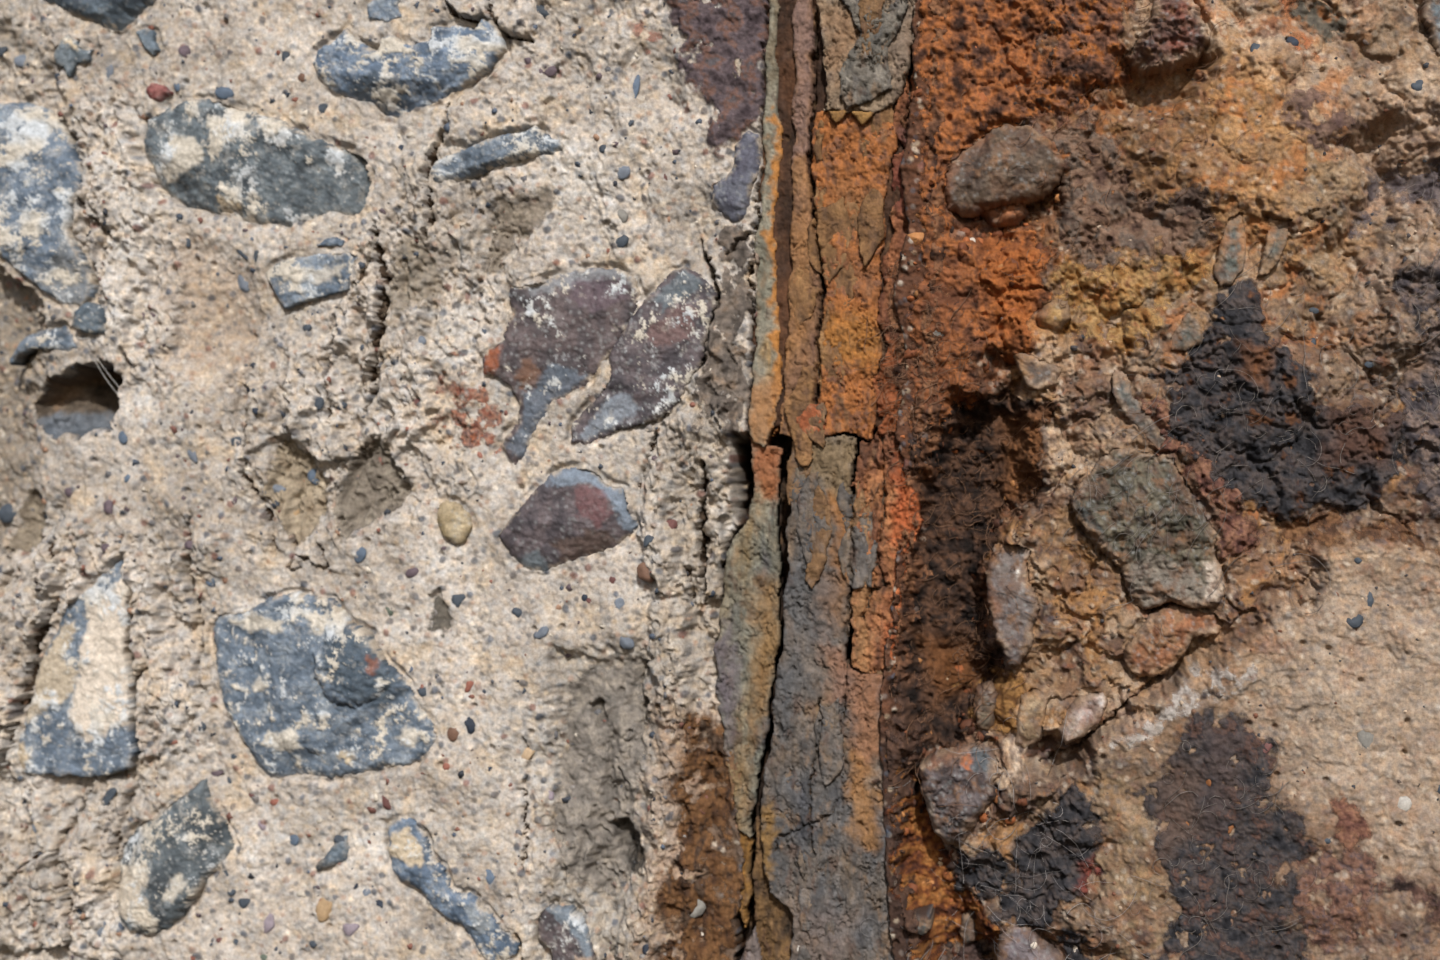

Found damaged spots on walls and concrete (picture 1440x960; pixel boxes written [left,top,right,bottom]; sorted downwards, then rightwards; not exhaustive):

crack [812,7,820,59]
crack [424,103,450,240]
crack [353,232,394,394]
crack [706,184,761,330]
crack [809,143,826,404]
rust [634,0,1440,960]
crack [47,543,60,559]
crack [5,607,58,756]
efflorescence [1110,659,1257,747]
crack [33,809,84,946]
crack [115,793,136,854]